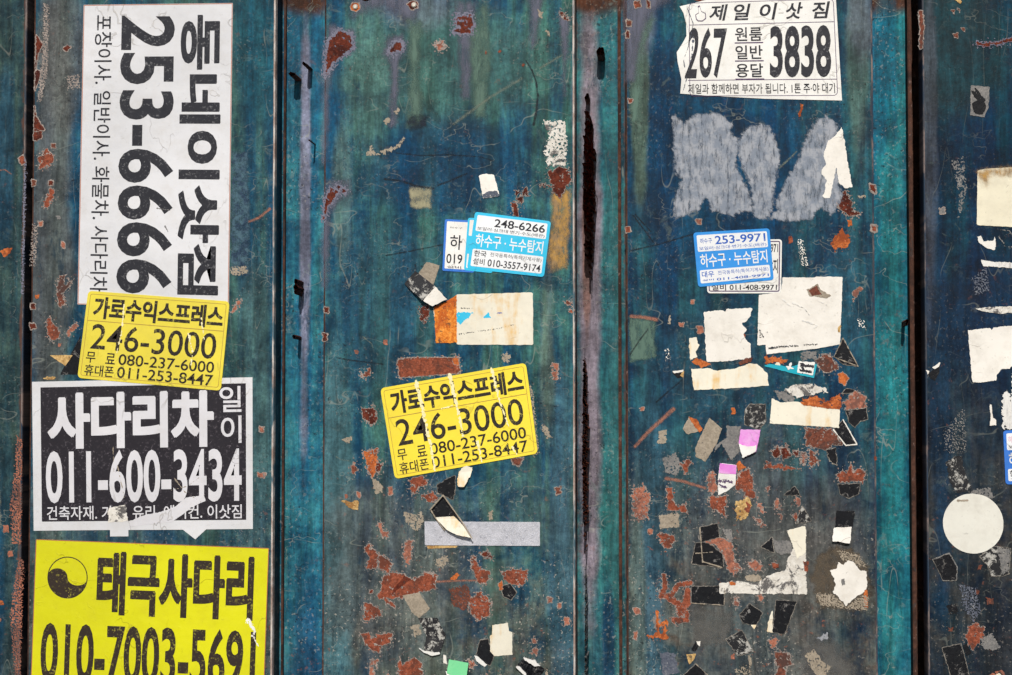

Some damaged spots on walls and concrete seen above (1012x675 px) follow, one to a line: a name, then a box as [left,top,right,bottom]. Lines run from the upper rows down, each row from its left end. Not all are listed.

corrosion [0,154,54,310]
corrosion [816,590,869,611]